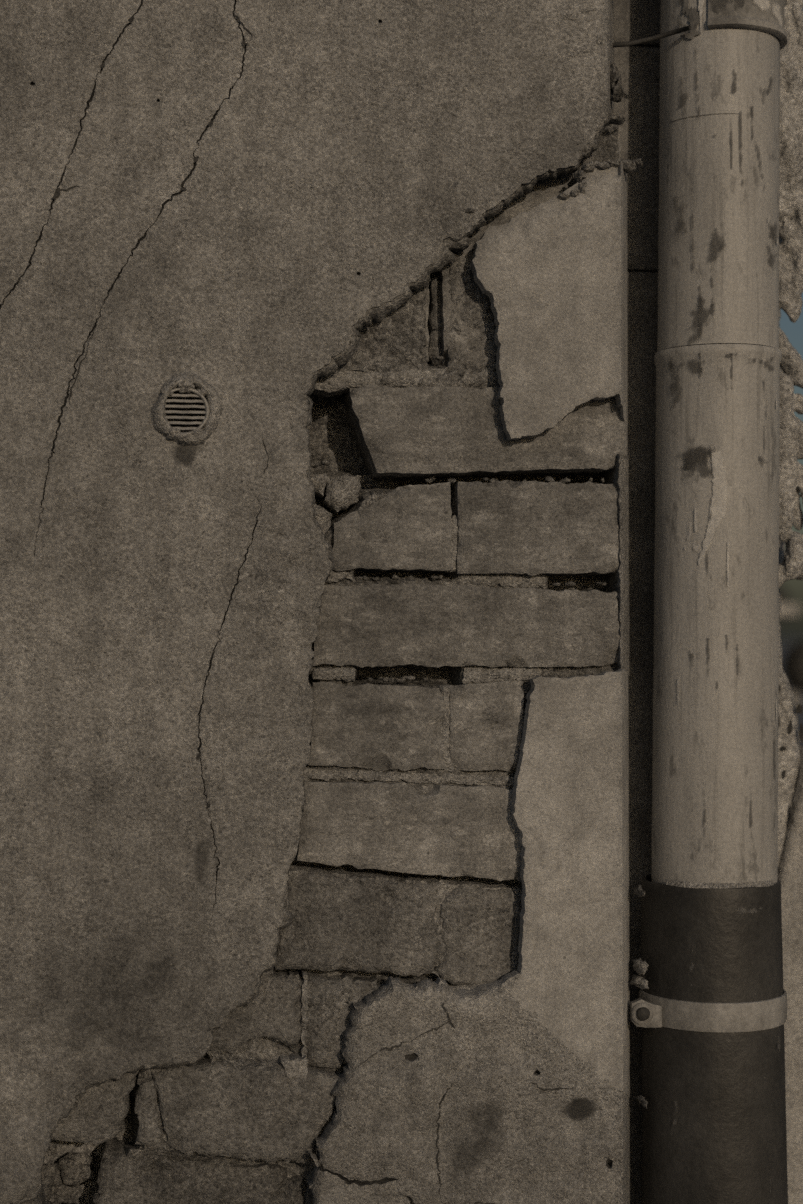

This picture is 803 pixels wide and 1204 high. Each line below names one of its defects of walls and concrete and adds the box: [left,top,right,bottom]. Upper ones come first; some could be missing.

crack [0,0,143,310]
crack [34,0,253,555]
crack [196,441,269,925]
spalling [5,62,643,1204]